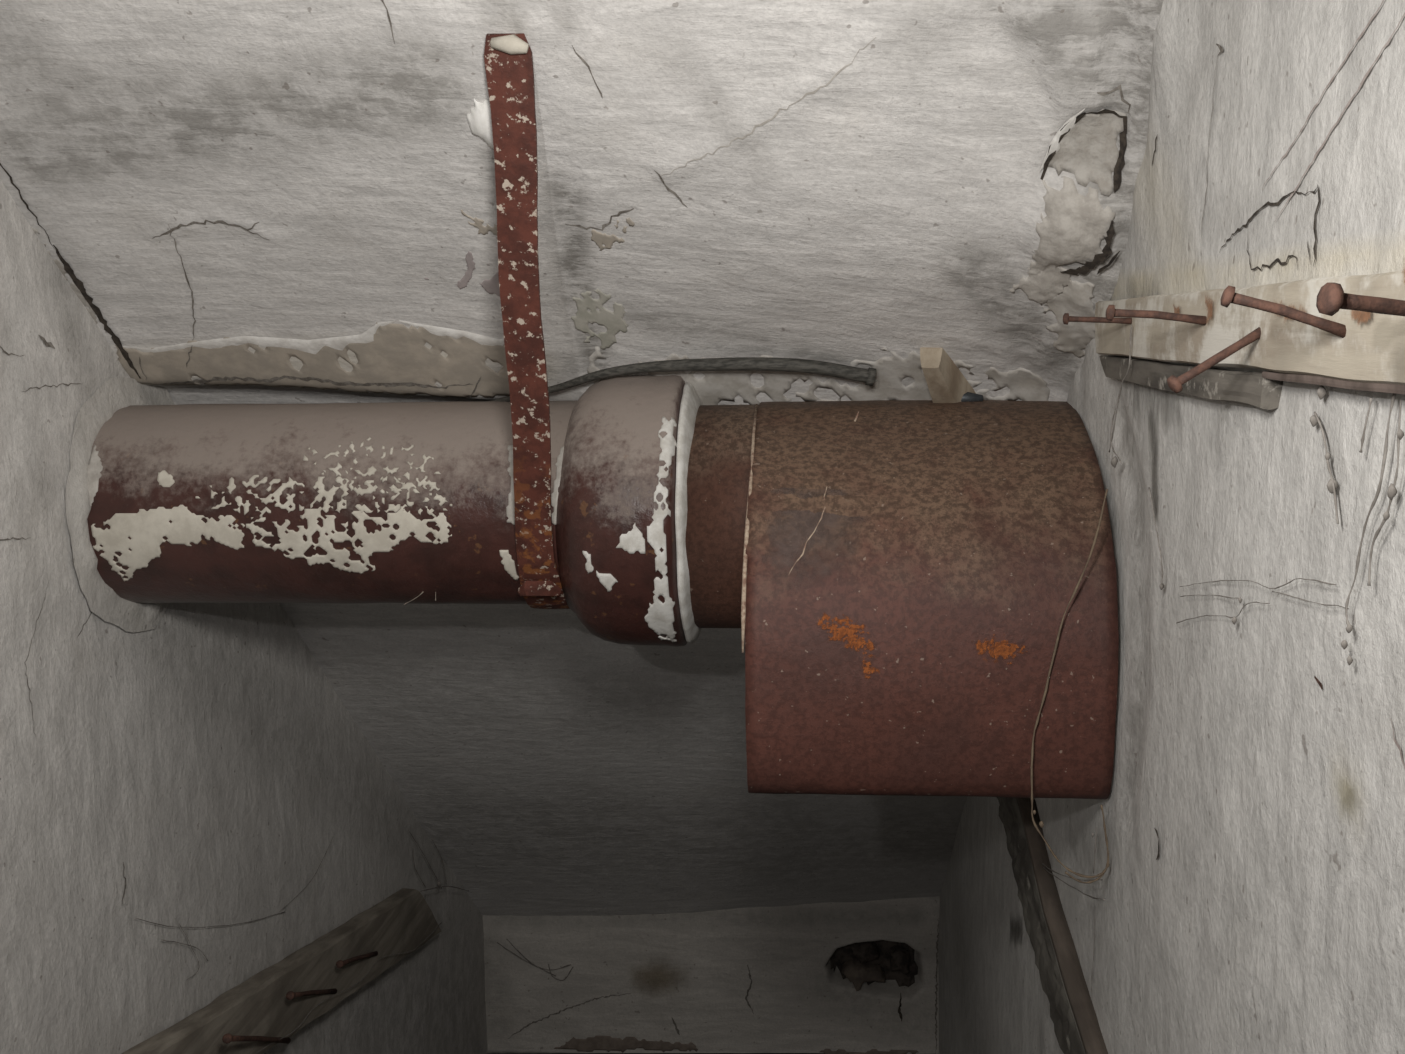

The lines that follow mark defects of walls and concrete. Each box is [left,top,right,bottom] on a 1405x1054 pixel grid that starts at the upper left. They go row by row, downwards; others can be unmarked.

crack [0,163,481,398]
flaking render [115,320,510,398]
crack [381,0,395,44]
flaking render [1010,85,1131,358]
crack [1200,0,1405,271]
flaking render [826,940,918,1021]